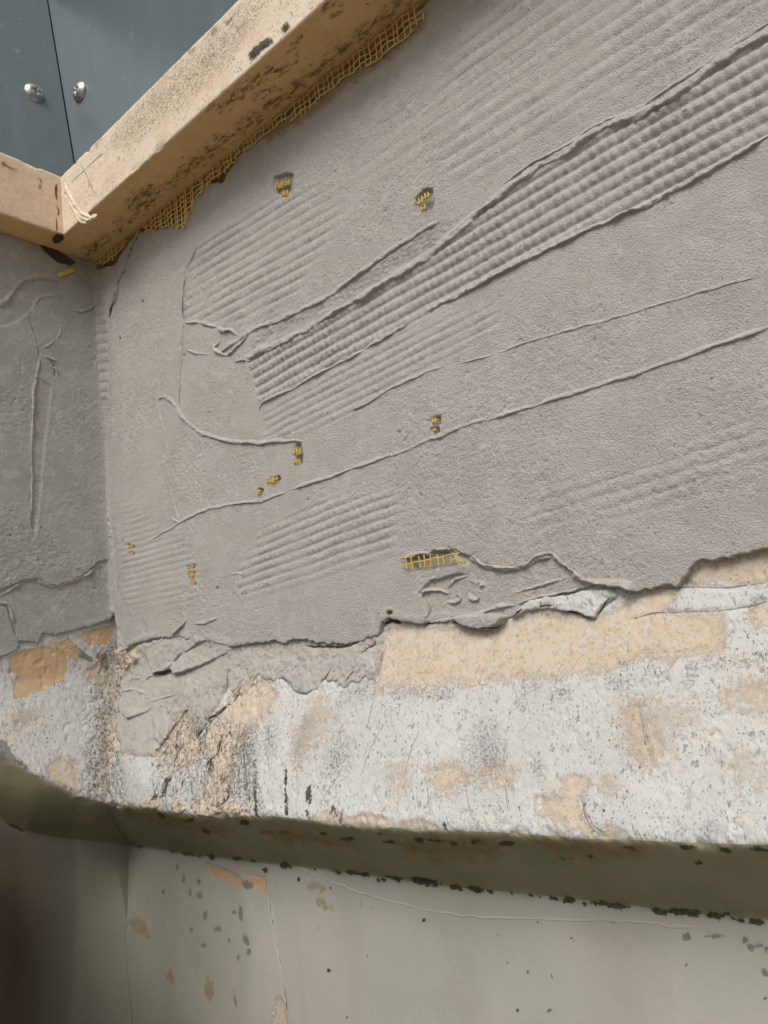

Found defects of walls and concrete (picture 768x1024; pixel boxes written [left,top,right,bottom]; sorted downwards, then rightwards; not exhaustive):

peeling [374,547,768,694]
peeling [9,625,279,834]
peeling [311,807,457,846]
peeling [534,775,639,852]